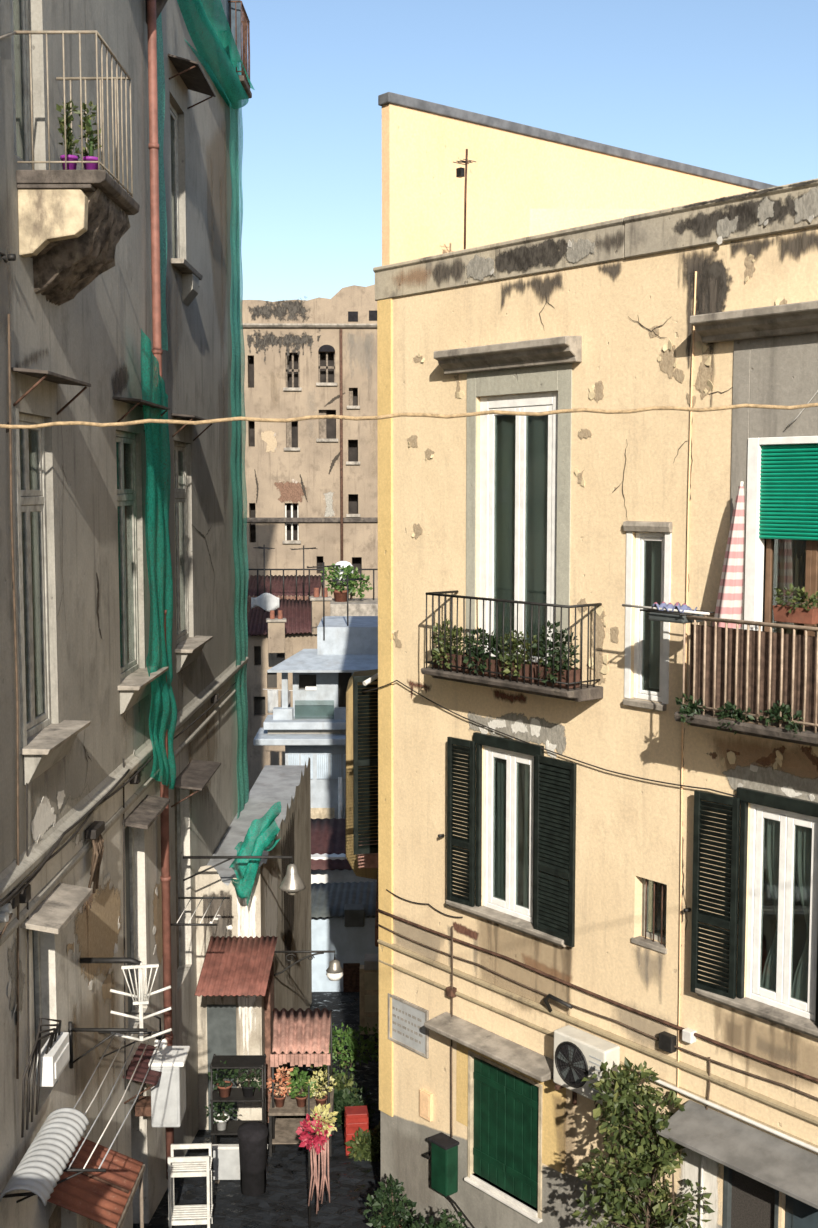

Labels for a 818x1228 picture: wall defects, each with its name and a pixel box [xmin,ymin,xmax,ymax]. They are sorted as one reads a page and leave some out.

leakage [433,260,465,286]
leakage [496,239,568,308]
leakage [596,232,625,280]
peeling [716,216,738,245]
leakage [674,180,818,368]
peeling [757,196,774,226]
peeling [794,187,818,223]
peeling [649,325,713,407]
crack [630,316,733,394]
peeling [467,712,567,758]
peeling [710,746,818,803]
peeling [66,872,122,1004]